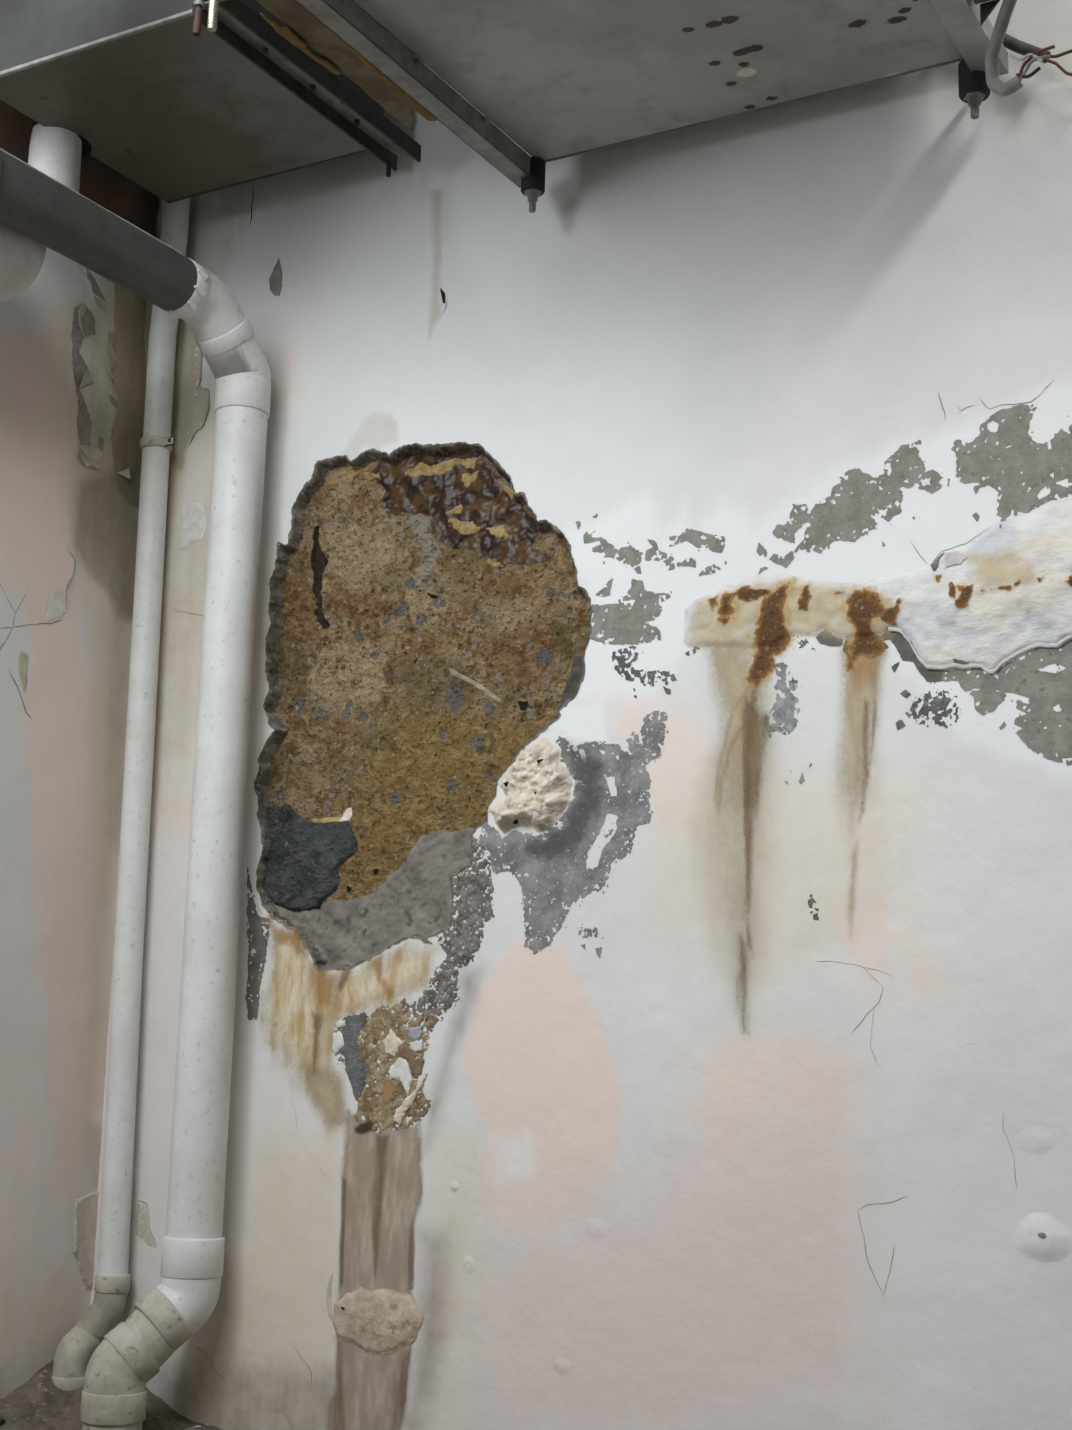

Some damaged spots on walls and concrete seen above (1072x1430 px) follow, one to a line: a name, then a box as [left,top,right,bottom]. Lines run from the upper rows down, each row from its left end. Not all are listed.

peeling [757,404,1072,574]
crack [0,584,61,719]
spalling [244,442,727,1021]
corrosion [708,579,811,687]
leakage [692,589,888,903]
corrosion [835,587,900,671]
peeling [879,627,1072,766]
leakage [261,919,434,1299]
peeling [332,998,442,1133]
crack [818,961,887,1069]
crack [858,1196,907,1293]
leakage [328,1337,411,1430]